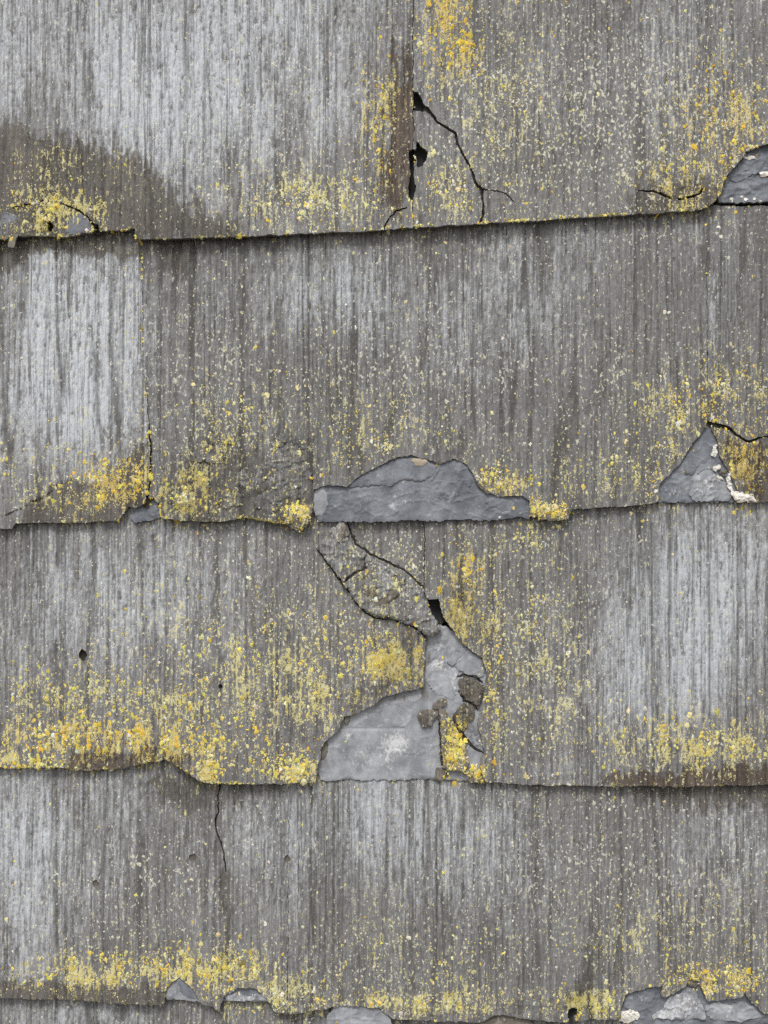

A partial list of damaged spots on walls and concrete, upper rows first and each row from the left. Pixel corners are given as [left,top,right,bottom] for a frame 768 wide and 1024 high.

crack [423,107,511,231]
crack [640,188,703,200]
spalling [715,145,768,209]
crack [706,421,768,443]
spalling [642,426,758,503]
spalling [216,432,530,783]
crack [215,784,227,872]
spalling [165,978,200,1002]
spalling [223,988,268,1002]
spalling [618,980,768,1024]